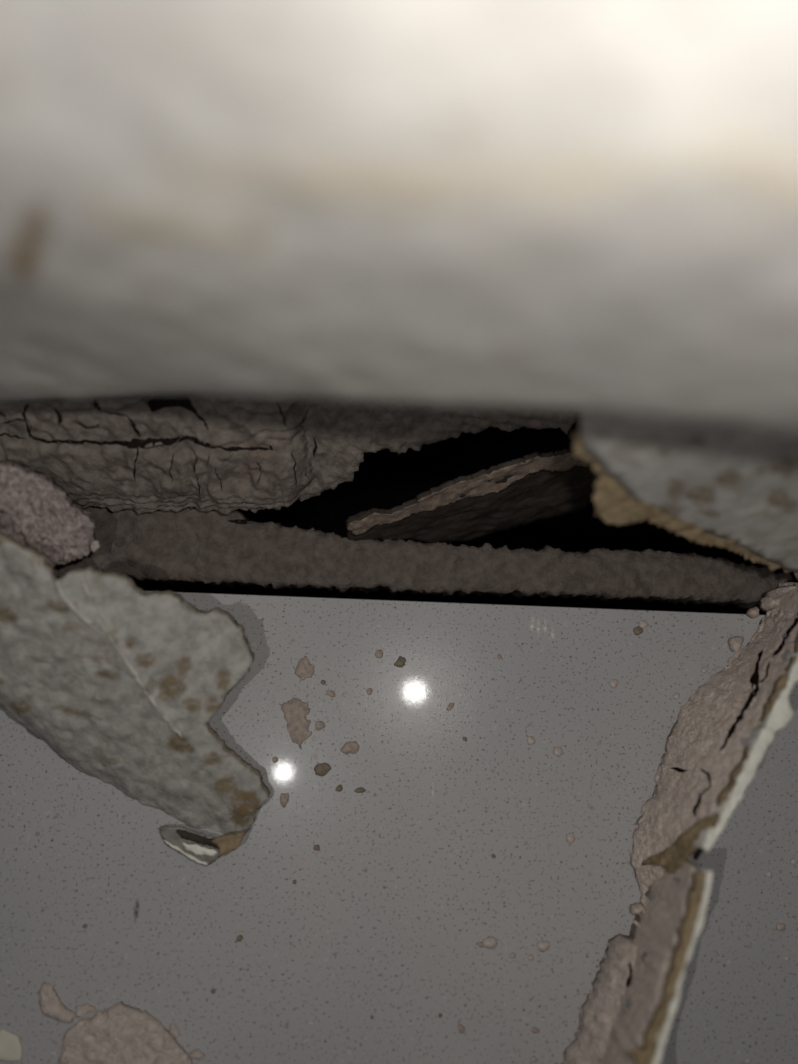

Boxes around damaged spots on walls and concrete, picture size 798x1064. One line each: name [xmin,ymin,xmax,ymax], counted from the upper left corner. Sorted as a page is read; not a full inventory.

crack [0,395,317,496]